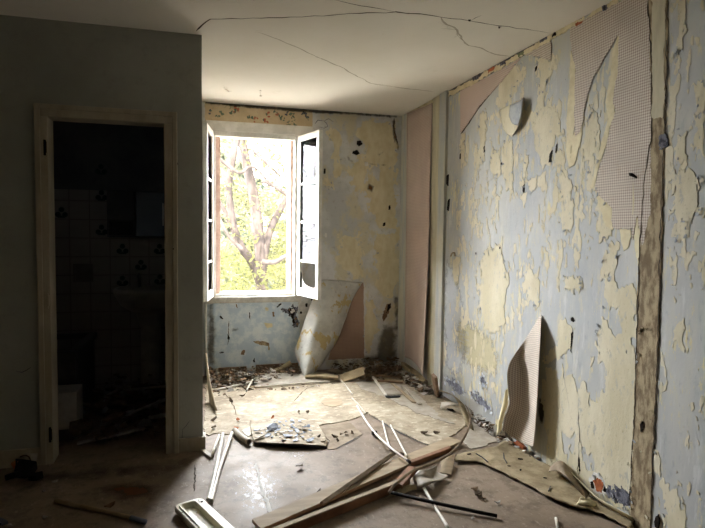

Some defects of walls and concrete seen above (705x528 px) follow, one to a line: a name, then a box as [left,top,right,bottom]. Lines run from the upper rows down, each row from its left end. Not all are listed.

crack [261,17,433,92]
crack [305,0,547,56]
peeling [347,117,400,234]
peeling [443,0,705,528]
spalling [264,298,313,328]
peeling [363,297,391,354]